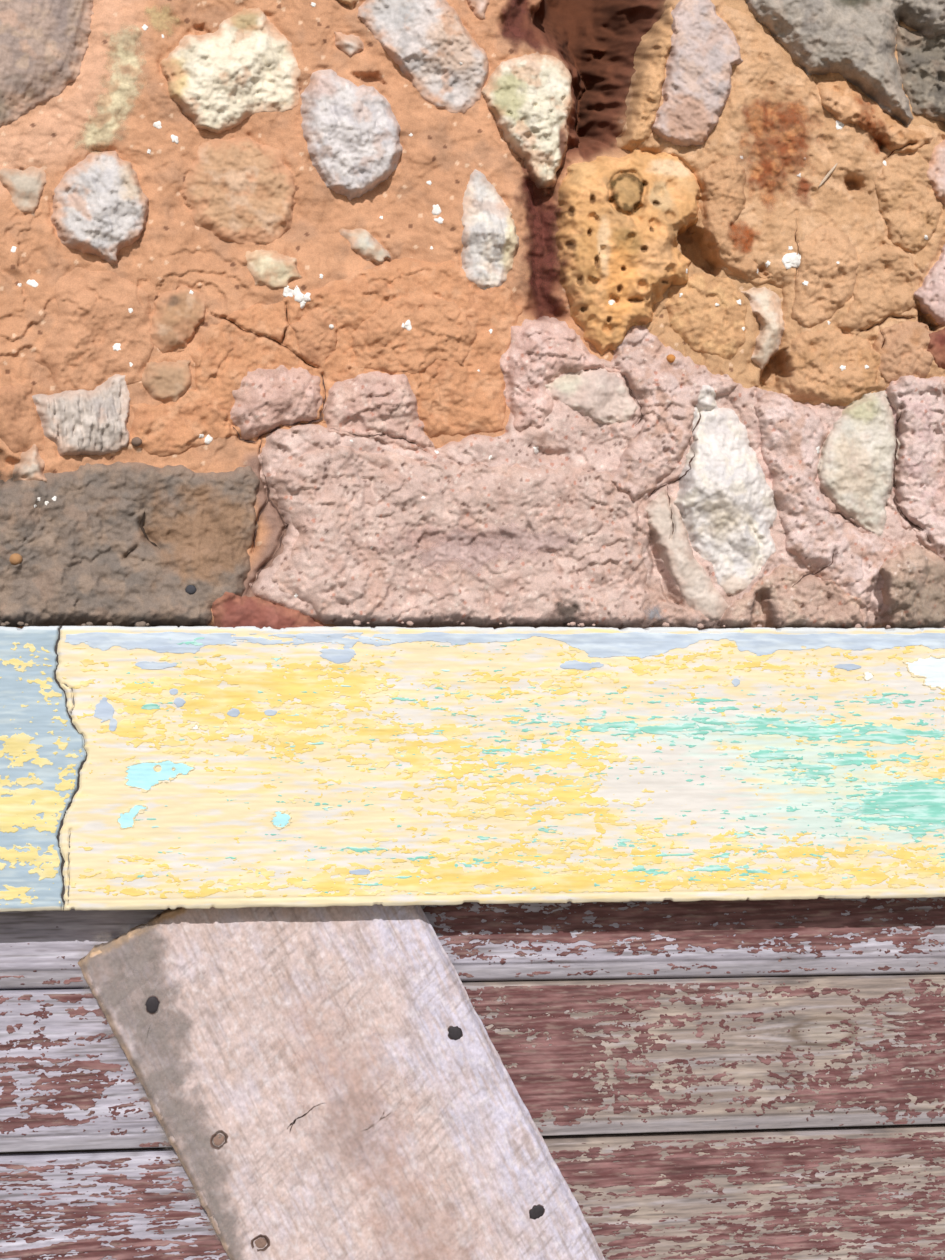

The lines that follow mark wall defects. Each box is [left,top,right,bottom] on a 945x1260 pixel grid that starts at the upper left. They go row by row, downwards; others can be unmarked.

leakage [502,0,540,49]
leakage [523,177,566,319]
leakage [610,174,644,213]
crack [645,414,701,534]
peeling [0,632,945,1260]